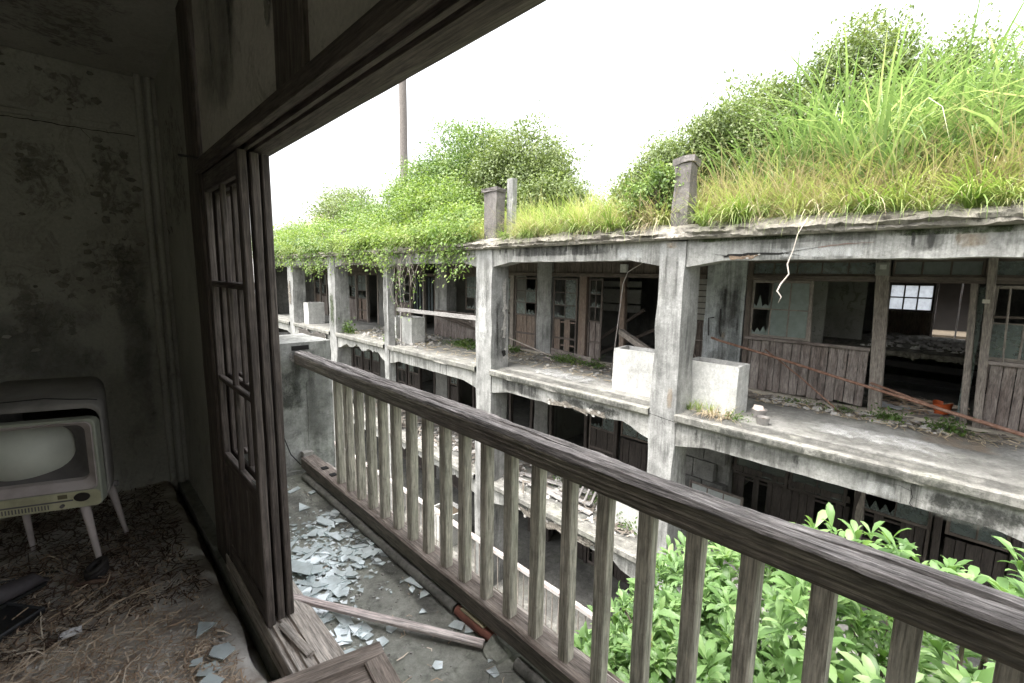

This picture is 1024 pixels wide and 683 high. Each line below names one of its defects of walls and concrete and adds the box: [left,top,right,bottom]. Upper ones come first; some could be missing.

crack [715,242,872,257]